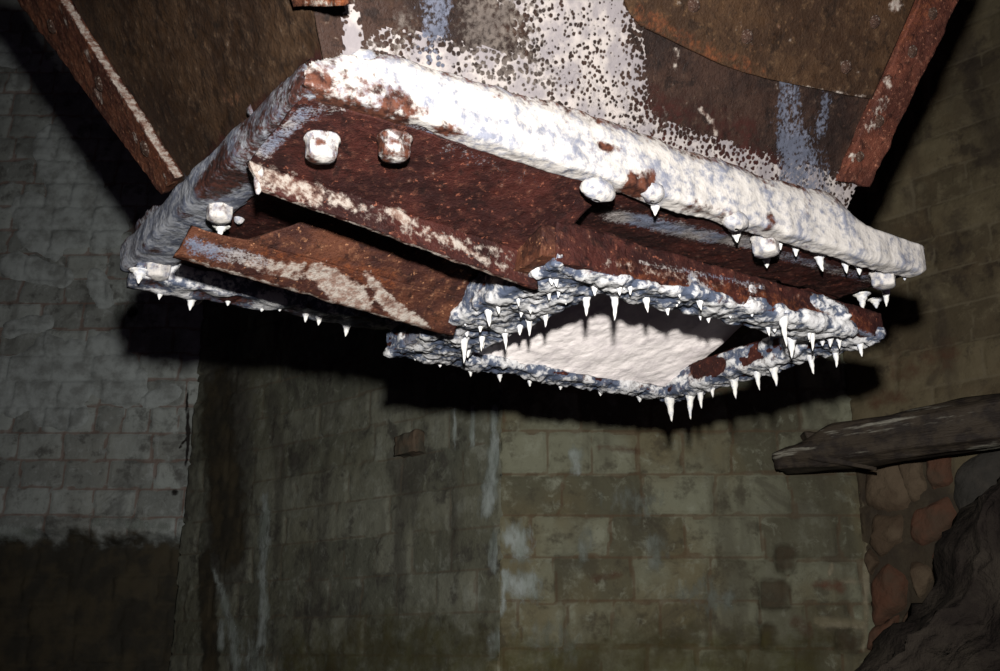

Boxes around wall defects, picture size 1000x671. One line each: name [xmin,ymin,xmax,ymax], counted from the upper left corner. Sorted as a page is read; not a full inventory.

damp [120,0,926,330]
rust [639,98,782,180]
crack [179,392,191,465]
damp [482,404,499,516]
damp [0,518,180,671]